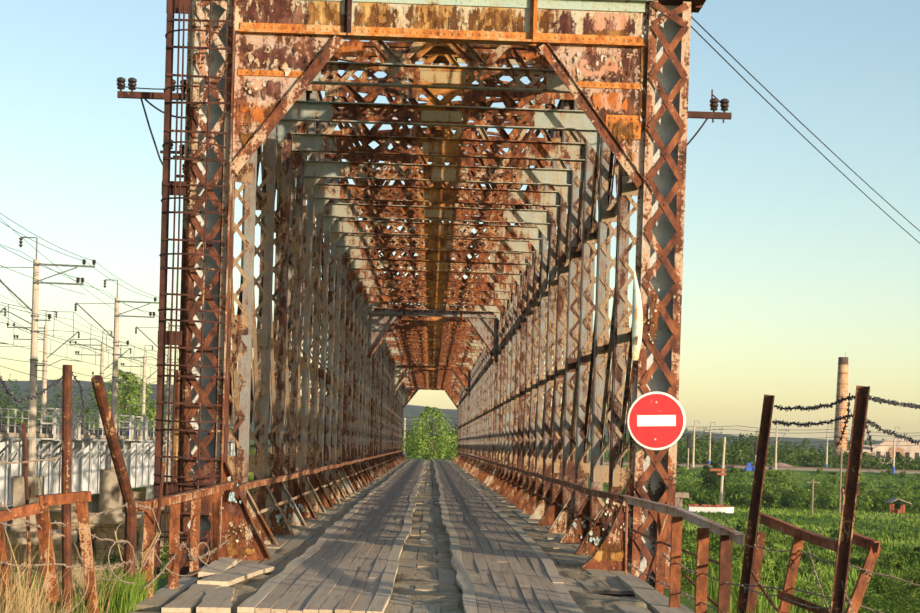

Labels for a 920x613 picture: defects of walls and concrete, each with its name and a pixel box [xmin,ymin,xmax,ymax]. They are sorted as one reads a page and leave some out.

peeling [243,43,300,94]
corrosion [288,55,309,71]
peeling [567,19,647,152]
corrosion [240,79,287,150]
corrosion [227,496,246,520]
peeling [572,495,626,546]
corrosion [593,540,625,563]